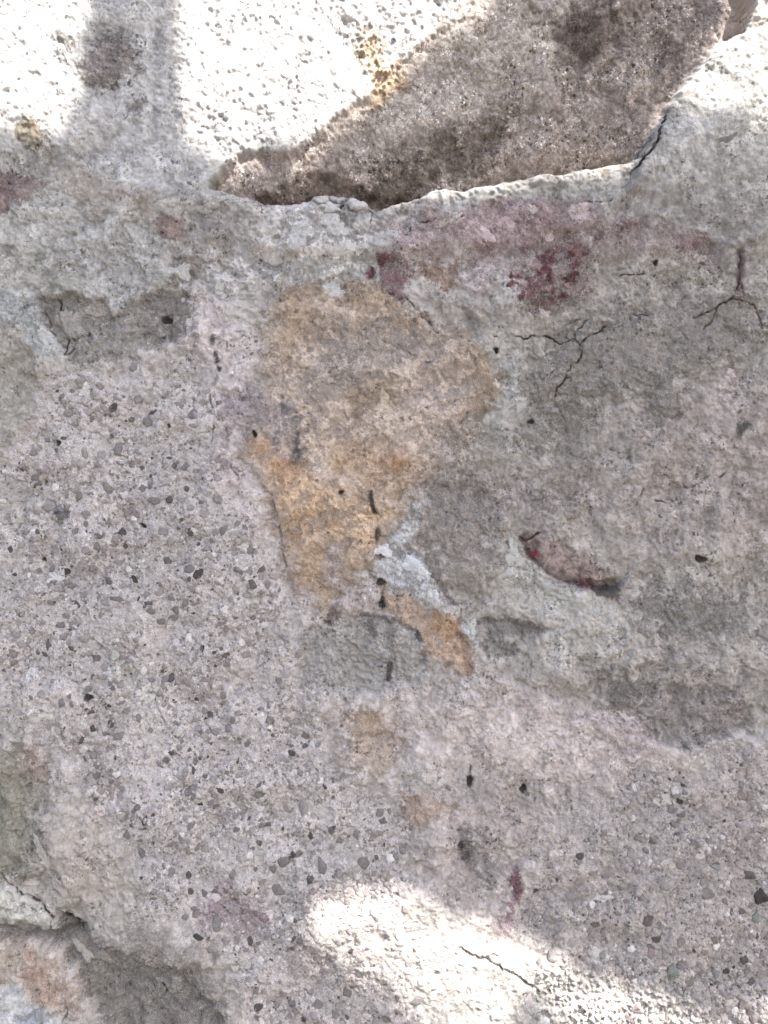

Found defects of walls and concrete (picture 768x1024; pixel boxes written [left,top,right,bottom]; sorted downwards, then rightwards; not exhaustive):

flaking render [558,2,622,62]
crack [634,112,667,170]
flaking render [195,193,241,215]
crack [701,252,763,329]
crack [516,319,605,420]
corrosion [220,282,497,611]
corrosion [382,590,474,676]